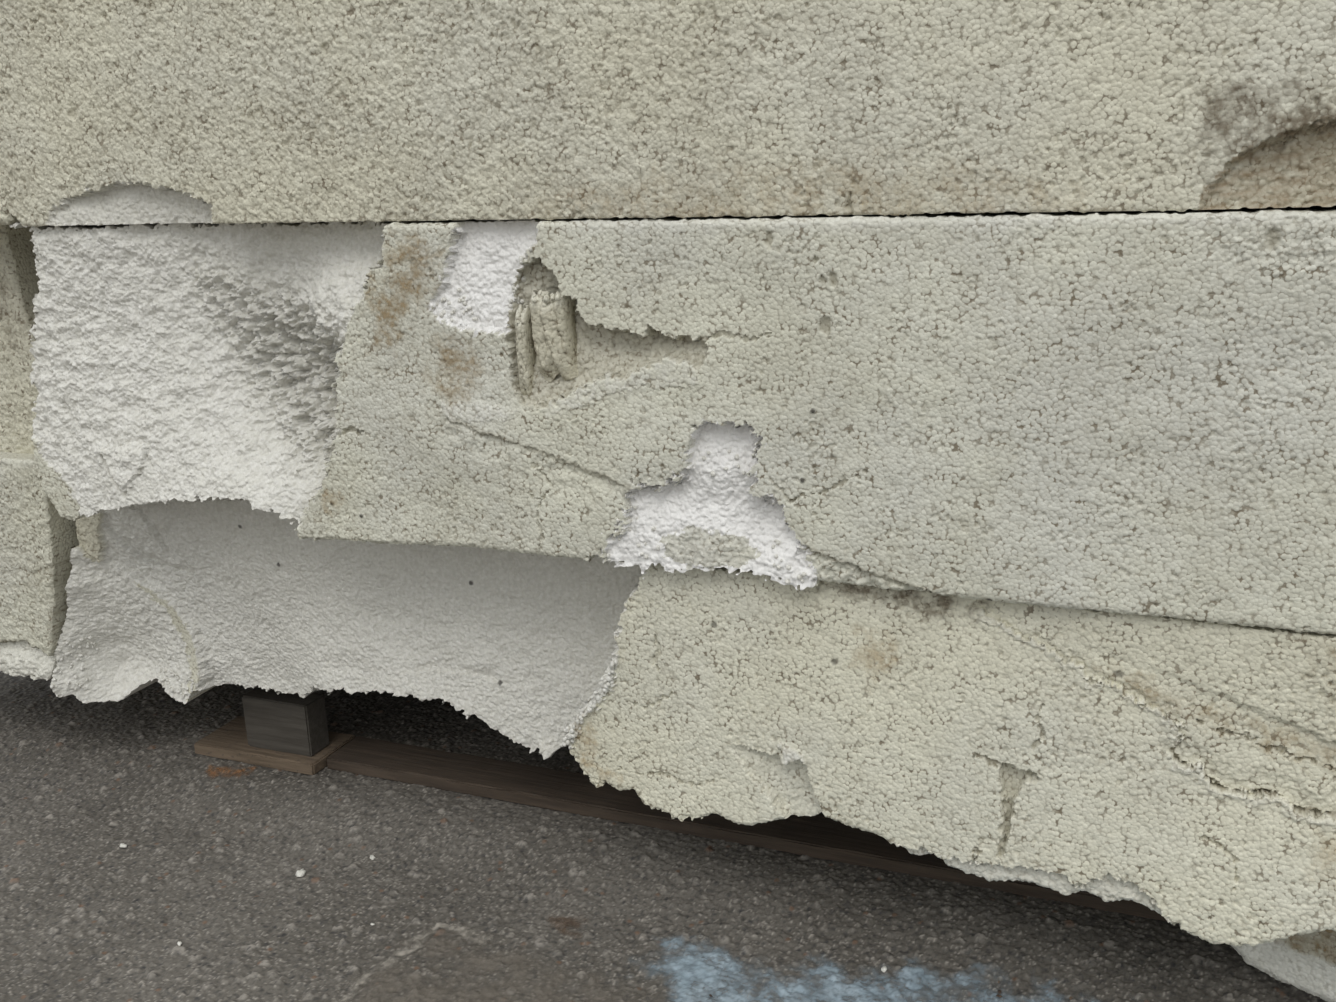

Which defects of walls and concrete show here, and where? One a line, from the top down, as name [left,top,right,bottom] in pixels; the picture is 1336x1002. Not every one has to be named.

spalling [0,180,818,760]
crack [972,703,1048,860]
crack [1169,719,1336,821]